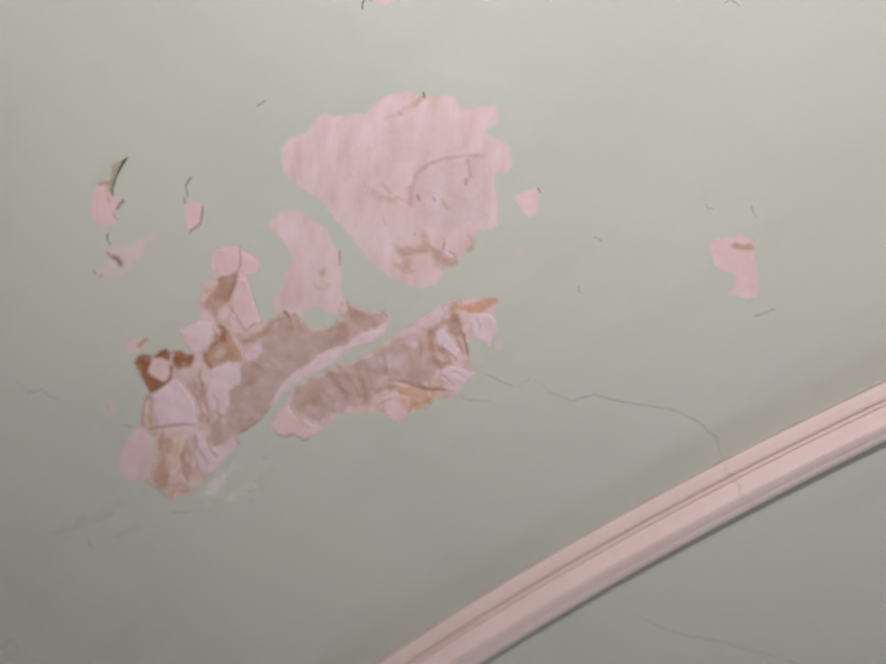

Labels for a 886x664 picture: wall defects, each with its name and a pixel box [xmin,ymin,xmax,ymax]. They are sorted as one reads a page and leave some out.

peeling [88,157,158,281]
peeling [116,89,515,502]
peeling [512,186,542,219]
peeling [707,231,761,302]